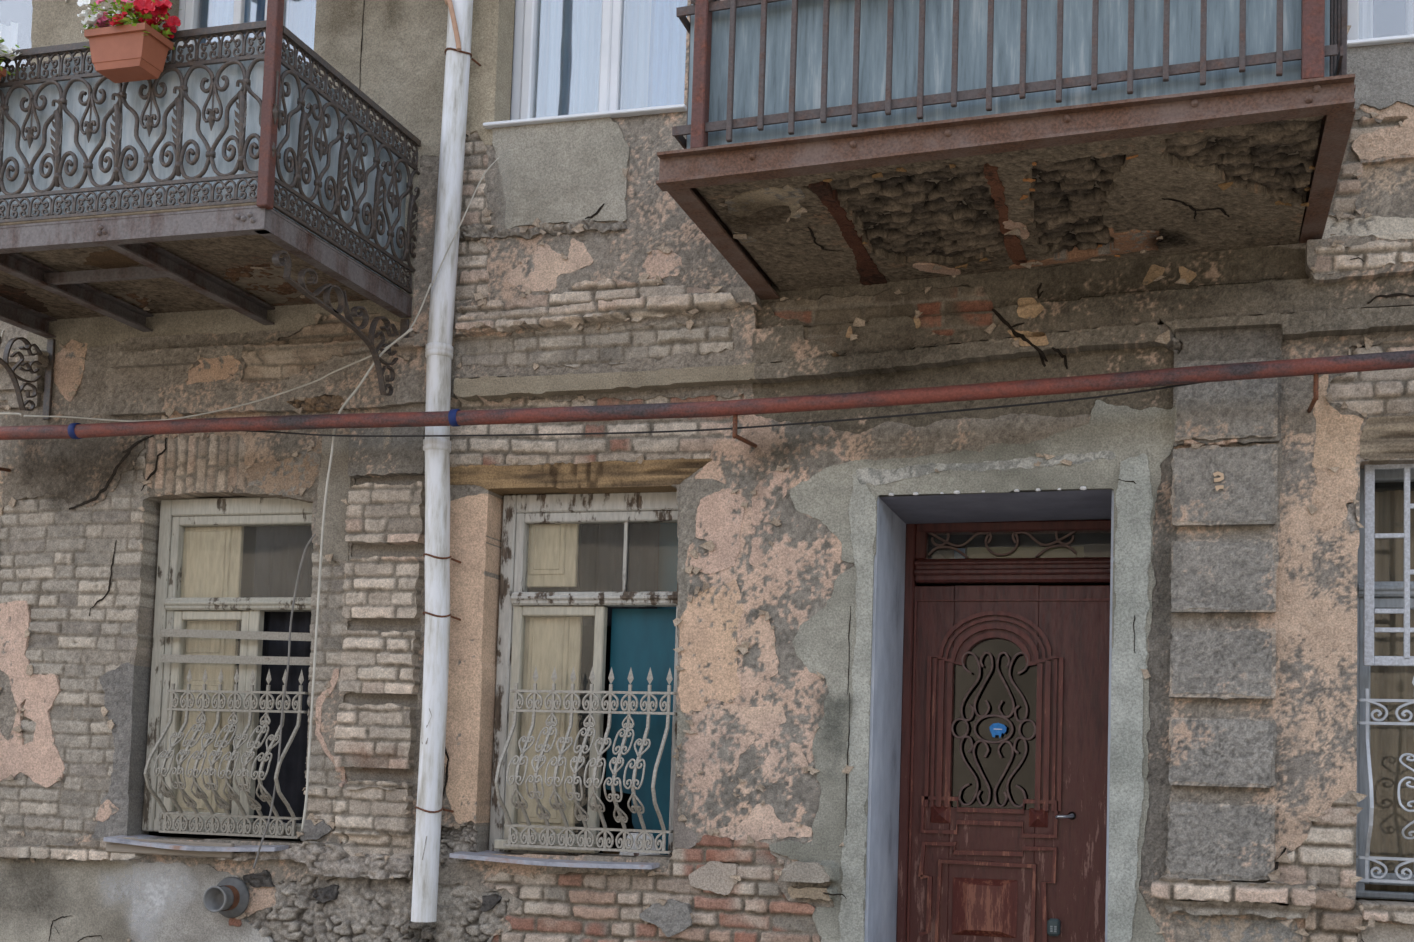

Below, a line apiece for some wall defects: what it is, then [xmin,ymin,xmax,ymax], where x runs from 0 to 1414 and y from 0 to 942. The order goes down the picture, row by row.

flaking render [452,130,741,370]
peeling [719,184,808,245]
spalling [769,154,1197,357]
crack [992,283,1068,369]
crack [1162,198,1230,220]
spalling [1162,115,1324,207]
flaking render [1311,102,1414,275]
crack [1367,293,1414,304]
crack [69,435,167,510]
flaking render [0,408,322,838]
peeling [229,394,1116,942]